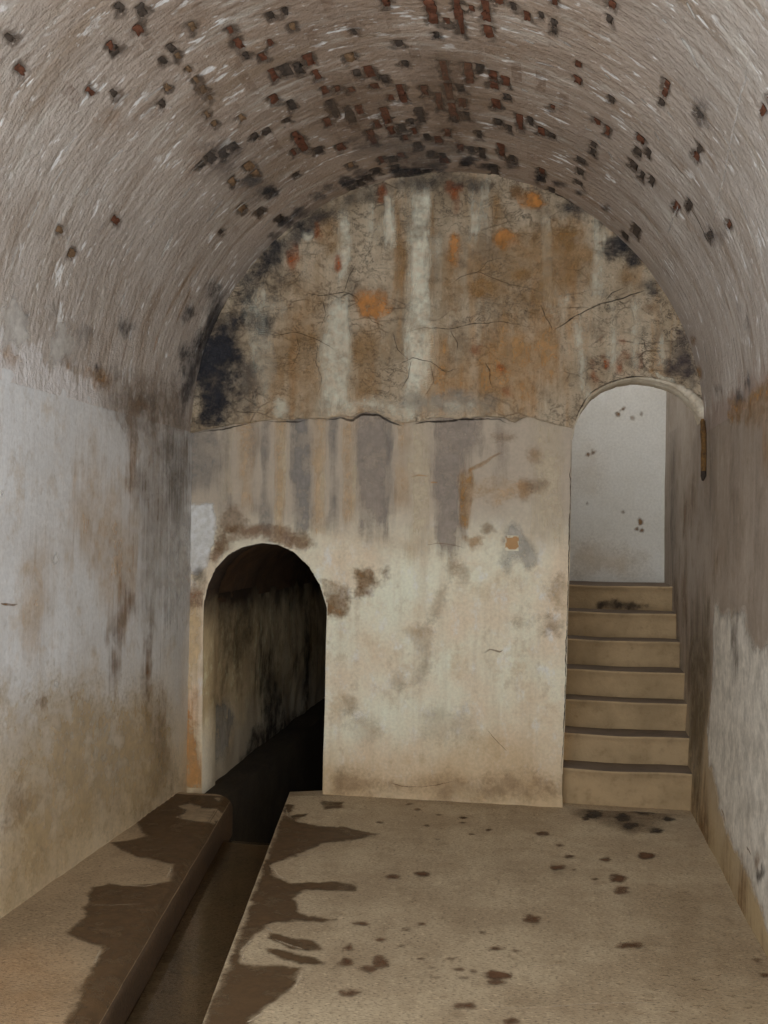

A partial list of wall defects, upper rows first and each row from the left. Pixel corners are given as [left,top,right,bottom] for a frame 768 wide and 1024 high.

spalling [113,2,153,37]
spalling [423,0,559,41]
spalling [157,42,221,130]
flaking render [190,25,702,433]
leakage [116,200,326,531]
leakage [231,301,391,547]
crack [268,265,520,394]
crack [329,413,506,425]
crack [457,260,642,328]
crack [576,376,644,418]
leakage [13,662,230,1024]
leakage [205,804,388,1024]